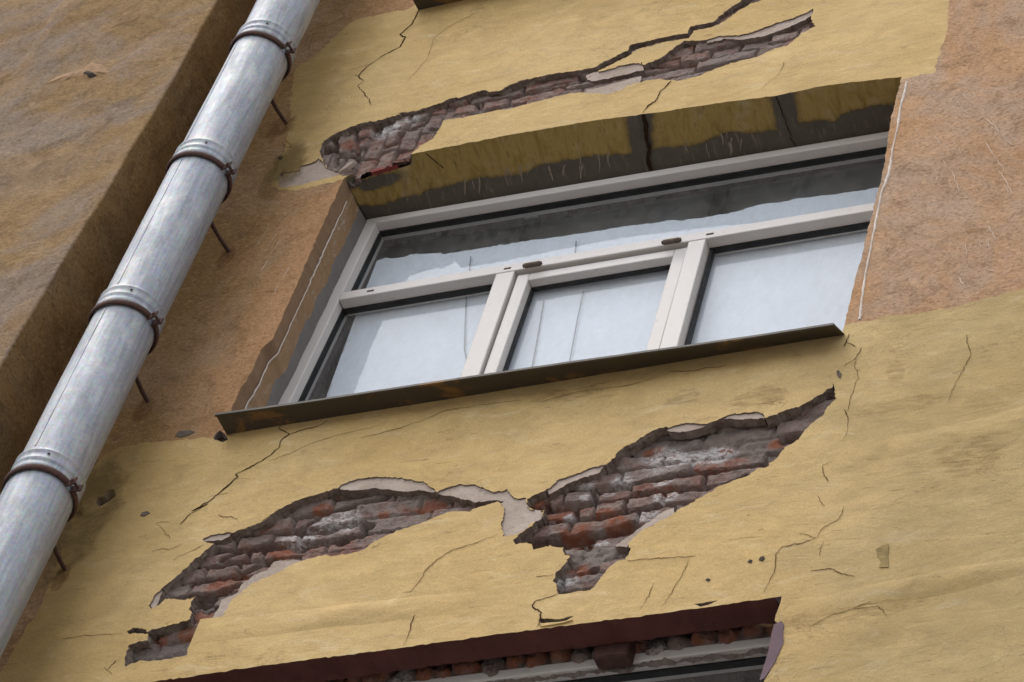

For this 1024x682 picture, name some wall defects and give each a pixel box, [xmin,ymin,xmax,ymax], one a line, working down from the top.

crack [356,9,420,104]
spalling [278,0,813,187]
crack [844,335,861,437]
crack [154,365,725,560]
crack [404,534,497,644]
spalling [130,399,835,664]
crack [532,574,569,626]
crack [627,555,695,605]
peeling [760,621,784,681]
crack [764,466,853,591]
peeling [876,544,889,568]